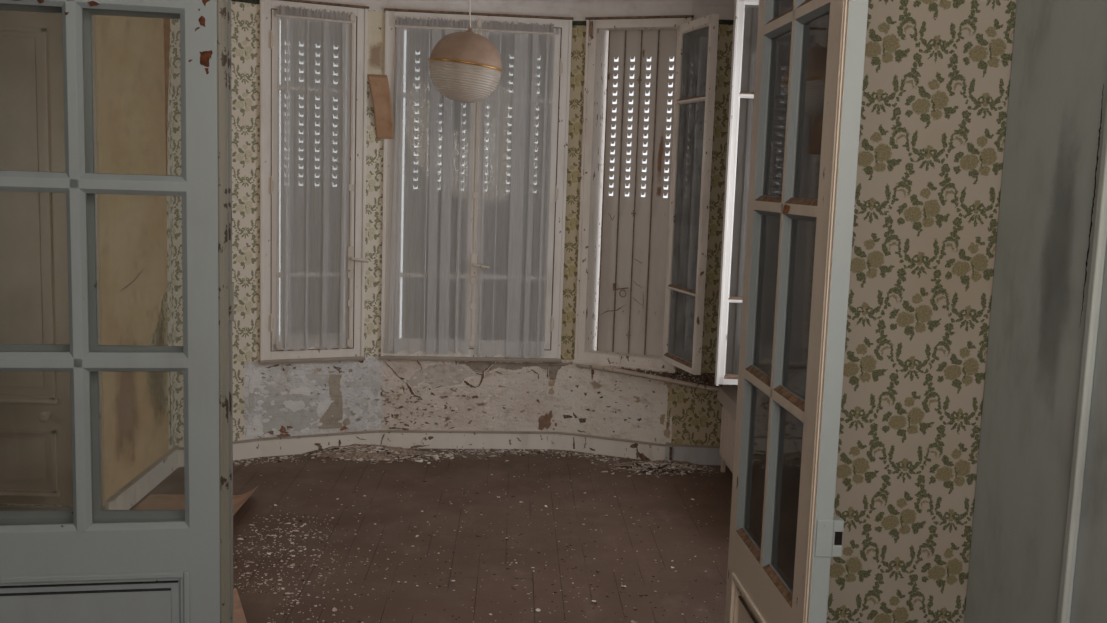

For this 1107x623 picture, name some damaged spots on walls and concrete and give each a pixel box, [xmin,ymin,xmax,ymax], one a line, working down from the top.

peeling [246,360,672,446]